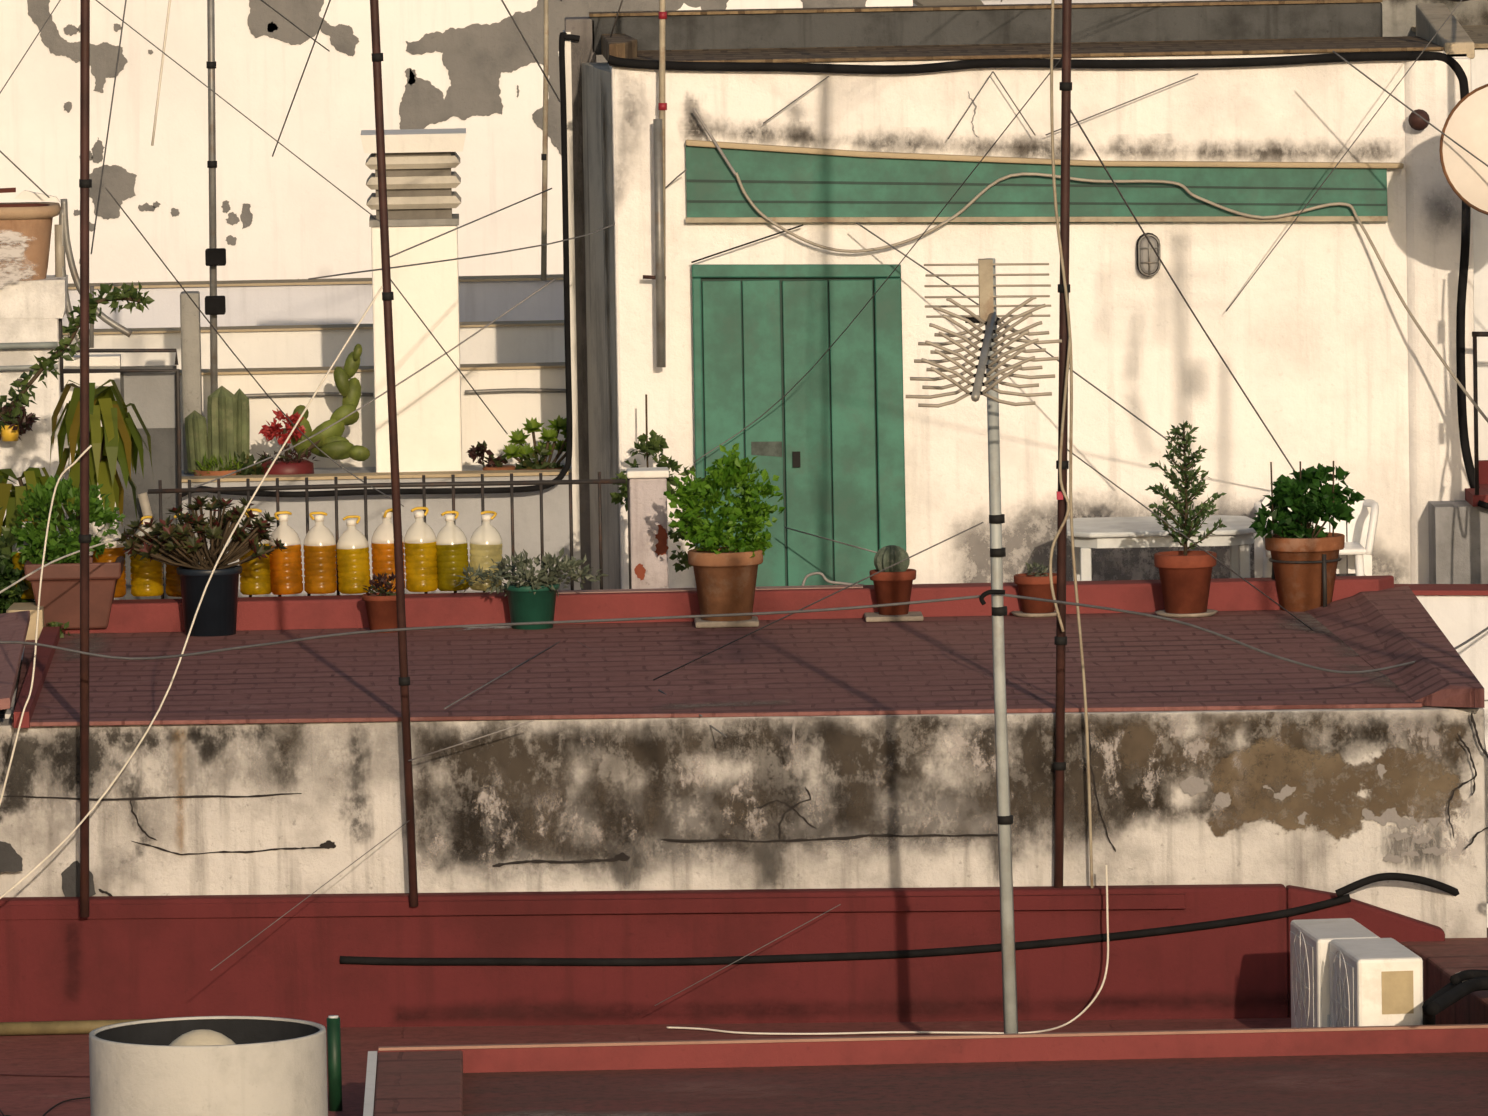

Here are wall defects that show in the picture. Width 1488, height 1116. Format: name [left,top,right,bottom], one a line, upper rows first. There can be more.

peeling [27,0,128,93]
peeling [247,0,359,56]
peeling [399,0,729,154]
peeling [801,0,867,8]
peeling [73,138,180,232]
peeling [0,230,36,288]
water stain [413,712,1474,885]
peeling [1180,736,1467,864]